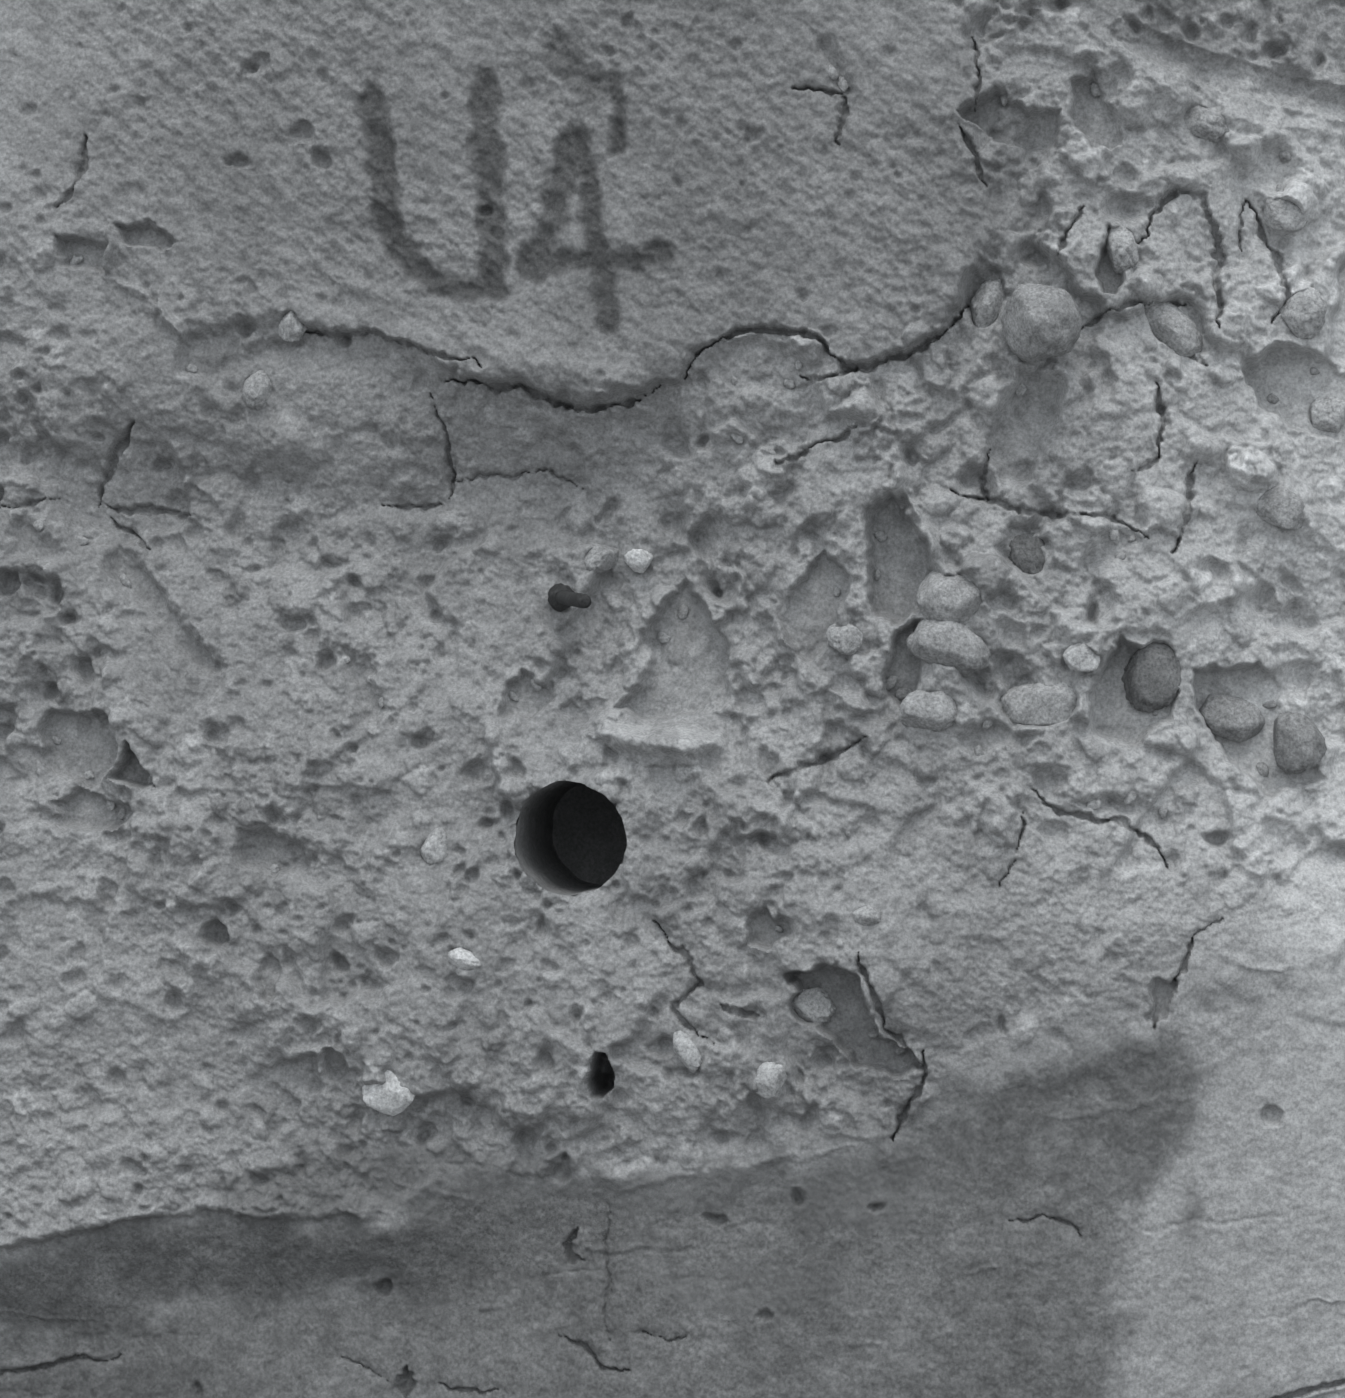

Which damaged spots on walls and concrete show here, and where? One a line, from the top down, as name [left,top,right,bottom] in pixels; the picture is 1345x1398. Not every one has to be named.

crack [310,310,965,511]
spalling [173,9,1345,886]
spalling [0,513,233,682]
spalling [36,709,156,833]
spalling [196,920,231,949]
spalling [784,963,923,1081]
crack [1148,918,1224,1030]
spalling [362,1070,416,1116]
crack [0,1354,122,1377]
crack [345,1357,499,1395]
crack [568,1245,630,1373]
crack [1273,1379,1345,1398]